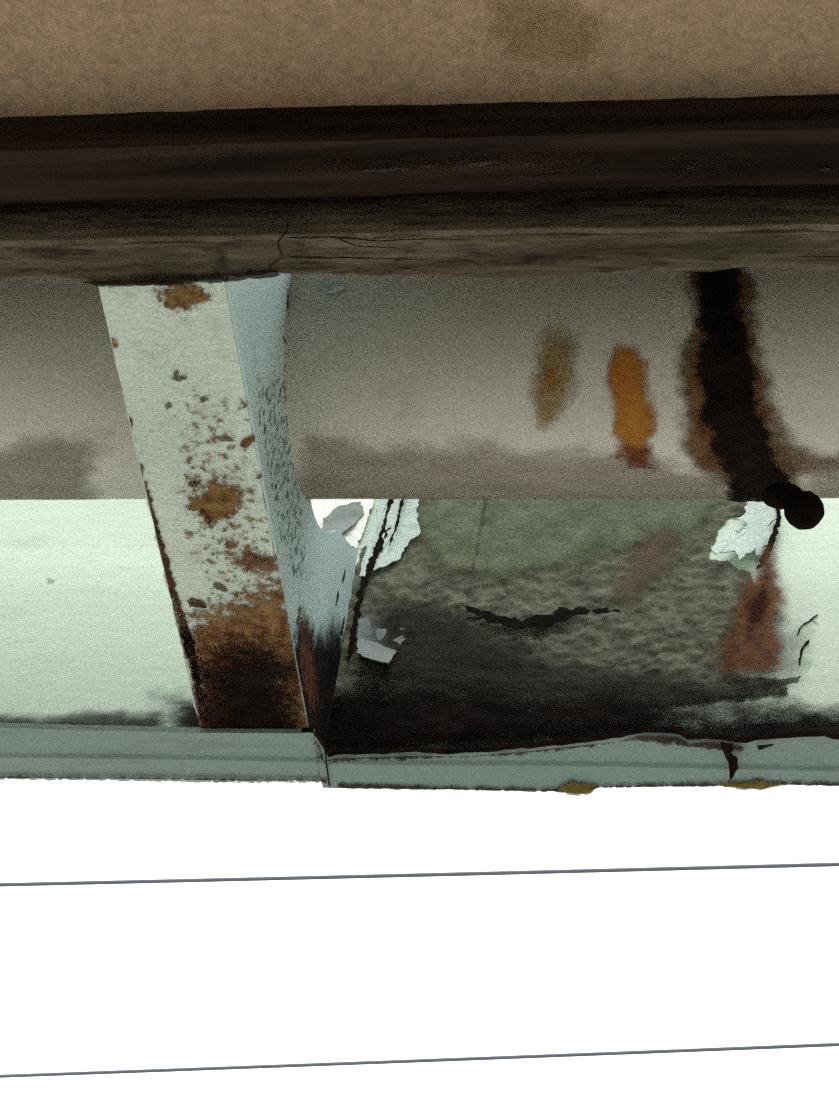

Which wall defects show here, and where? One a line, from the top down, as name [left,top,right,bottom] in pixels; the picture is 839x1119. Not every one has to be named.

rust [154,284,212,313]
rust [535,334,574,423]
rust [608,347,656,468]
rust [680,267,839,530]
rust [144,390,839,790]
peeling [311,498,802,708]
rust [0,775,561,793]